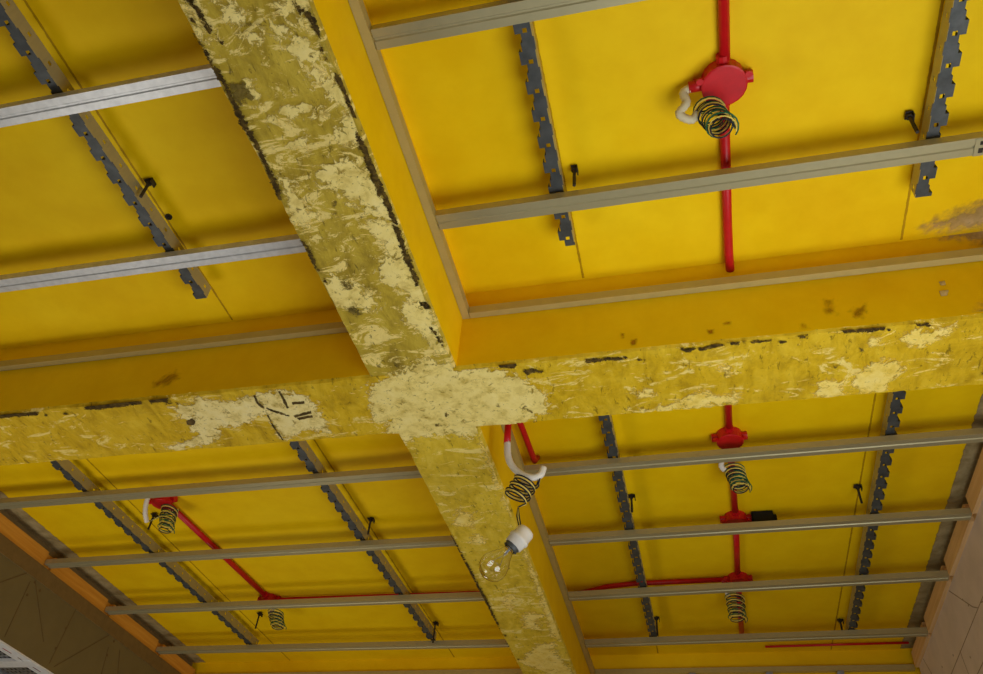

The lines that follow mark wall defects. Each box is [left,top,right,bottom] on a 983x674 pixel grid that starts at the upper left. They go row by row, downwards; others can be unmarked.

peeling [84,389,335,451]
peeling [180,0,558,518]